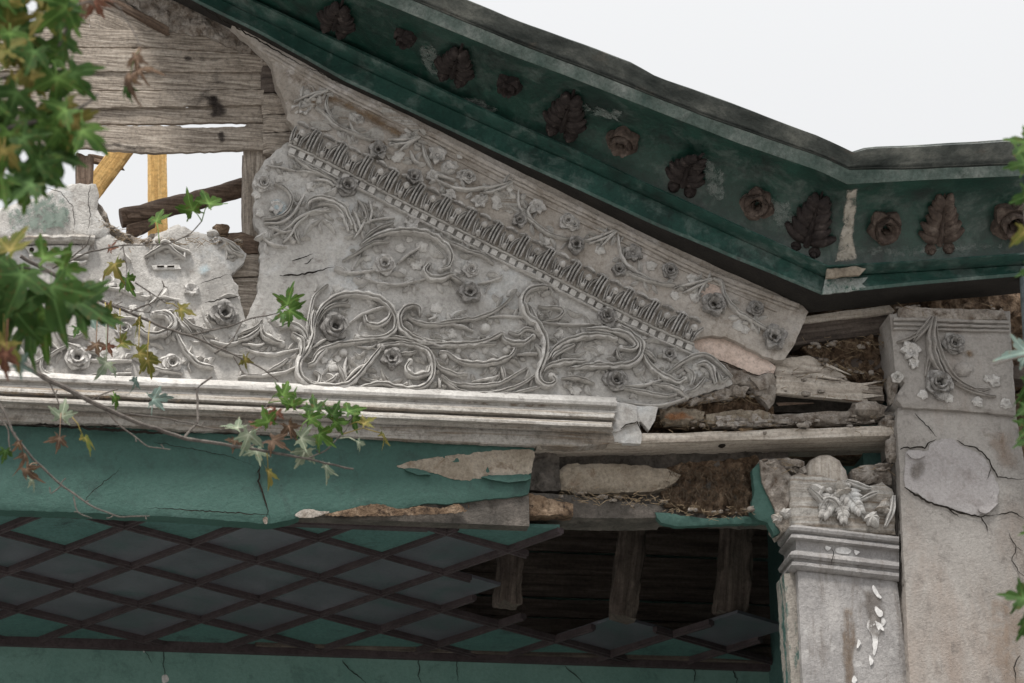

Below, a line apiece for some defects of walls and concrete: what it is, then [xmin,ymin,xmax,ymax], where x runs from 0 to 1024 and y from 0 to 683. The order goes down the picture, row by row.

crack [280,254,333,276]
peeling [821,189,868,295]
spalling [652,338,777,432]
crack [27,423,269,517]
peeling [397,449,535,483]
crack [900,414,1022,480]
peeling [295,504,464,518]